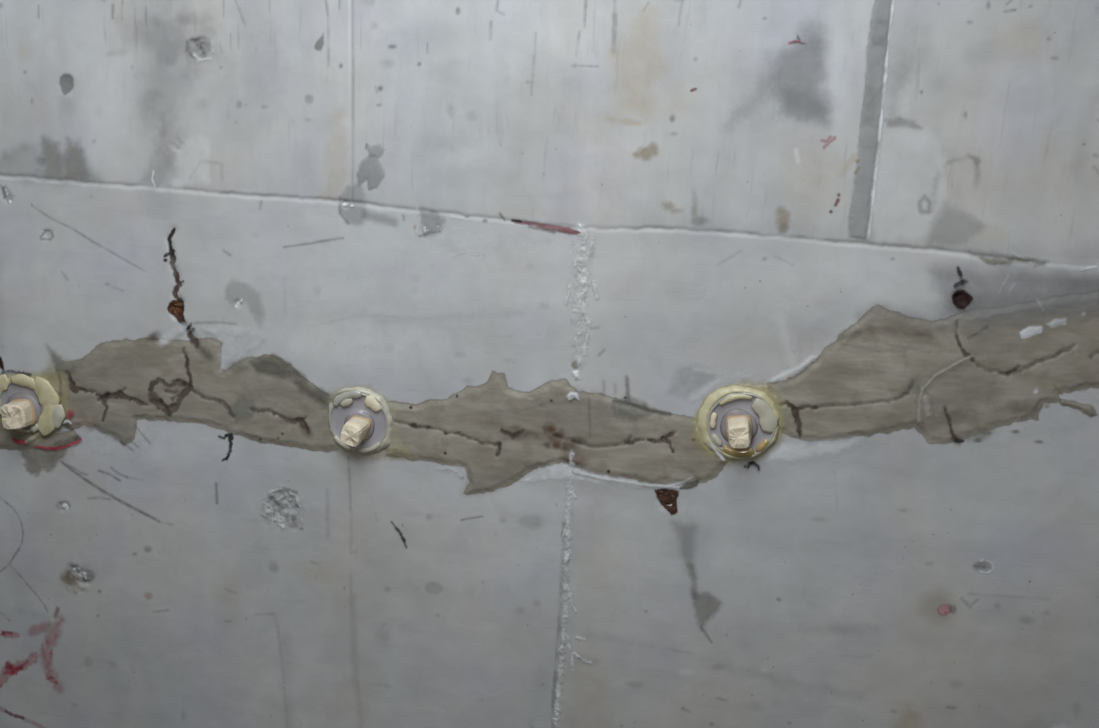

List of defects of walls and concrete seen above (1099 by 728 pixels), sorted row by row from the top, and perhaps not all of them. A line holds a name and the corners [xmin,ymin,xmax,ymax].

crack [67,228,309,461]
crack [956,334,973,361]
crack [0,368,31,376]
crack [394,406,524,456]
crack [628,432,695,453]
crack [780,401,817,435]
crack [946,414,963,443]